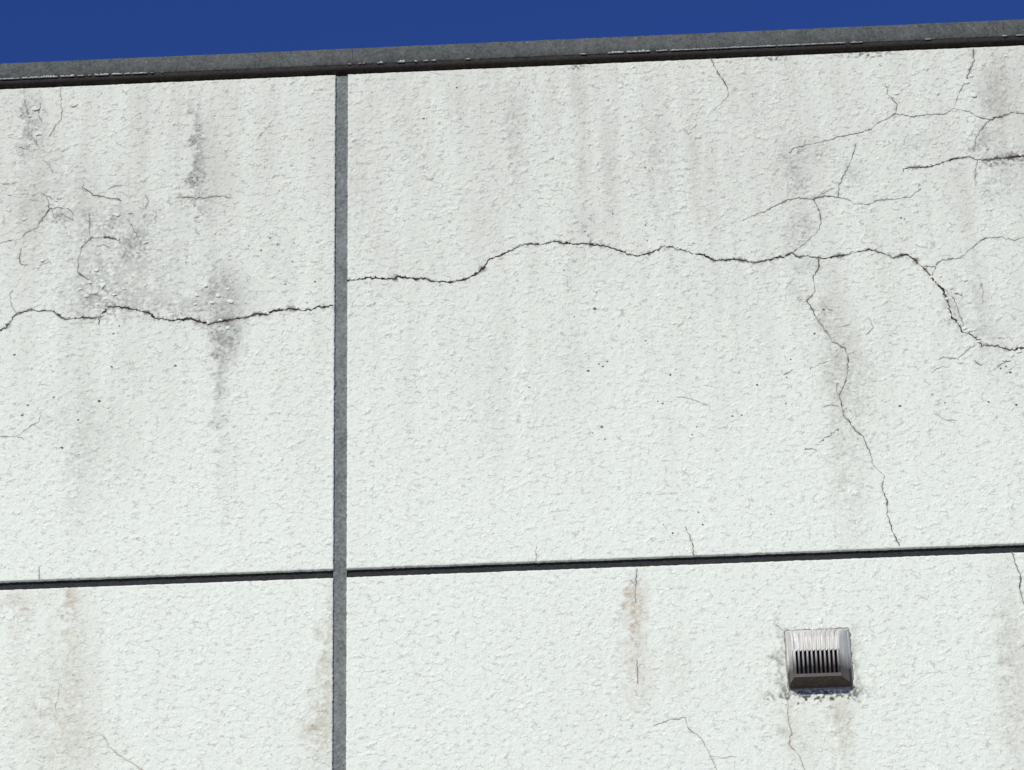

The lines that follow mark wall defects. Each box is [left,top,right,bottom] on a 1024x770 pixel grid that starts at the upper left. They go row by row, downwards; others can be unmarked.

crack [6,91,156,286]
crack [0,290,334,331]
crack [347,48,1024,545]